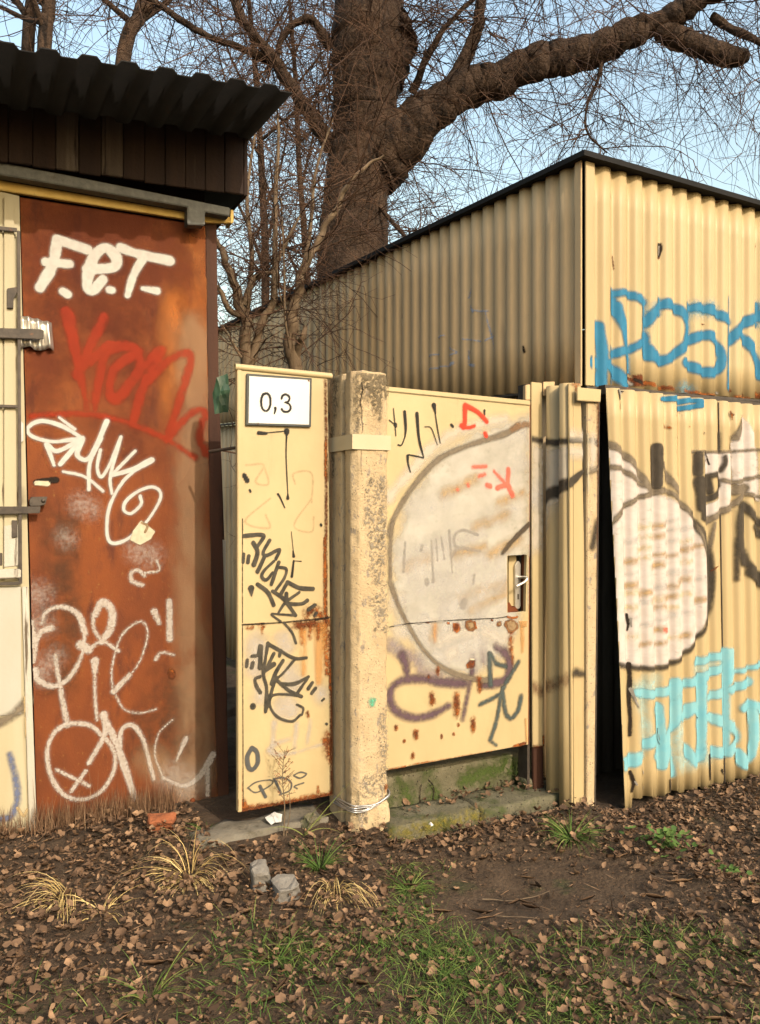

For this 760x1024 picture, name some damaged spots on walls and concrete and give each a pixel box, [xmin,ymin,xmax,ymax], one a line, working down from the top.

rust [163,230,207,650]
rust [238,380,333,812]
rust [167,663,201,737]
rust [147,754,200,801]
leakage [457,757,518,789]